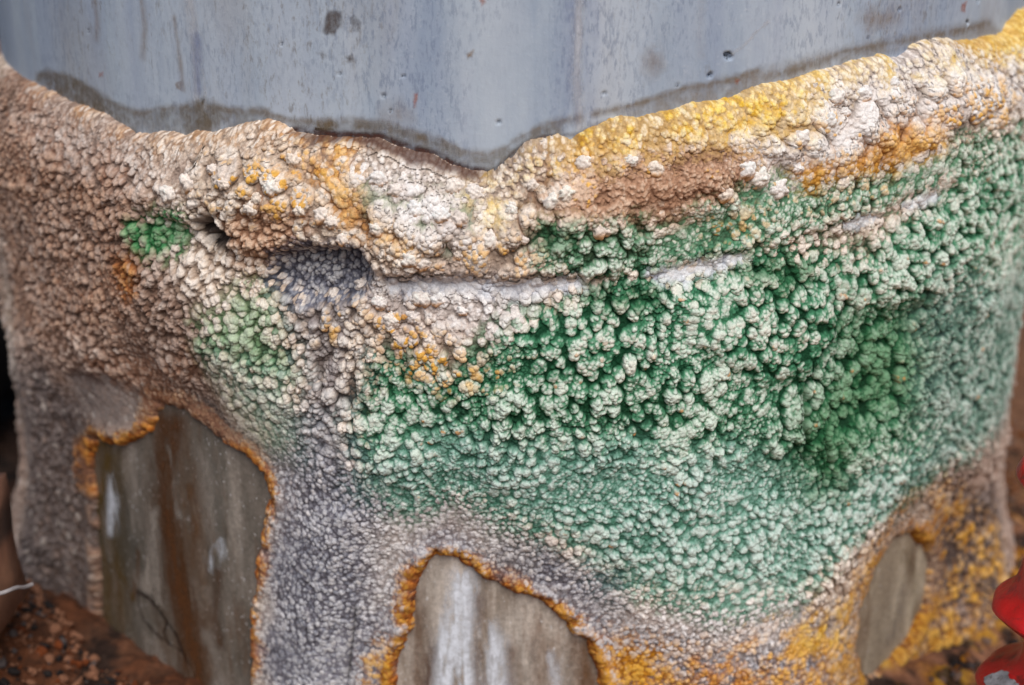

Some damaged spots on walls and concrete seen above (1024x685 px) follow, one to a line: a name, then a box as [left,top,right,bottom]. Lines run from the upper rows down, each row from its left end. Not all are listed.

leakage [394,199,427,219]
leakage [431,207,471,250]
leakage [309,337,322,350]
leakage [318,307,341,348]
peeling [94,403,272,685]
peeling [396,554,599,685]
peeling [855,532,927,675]